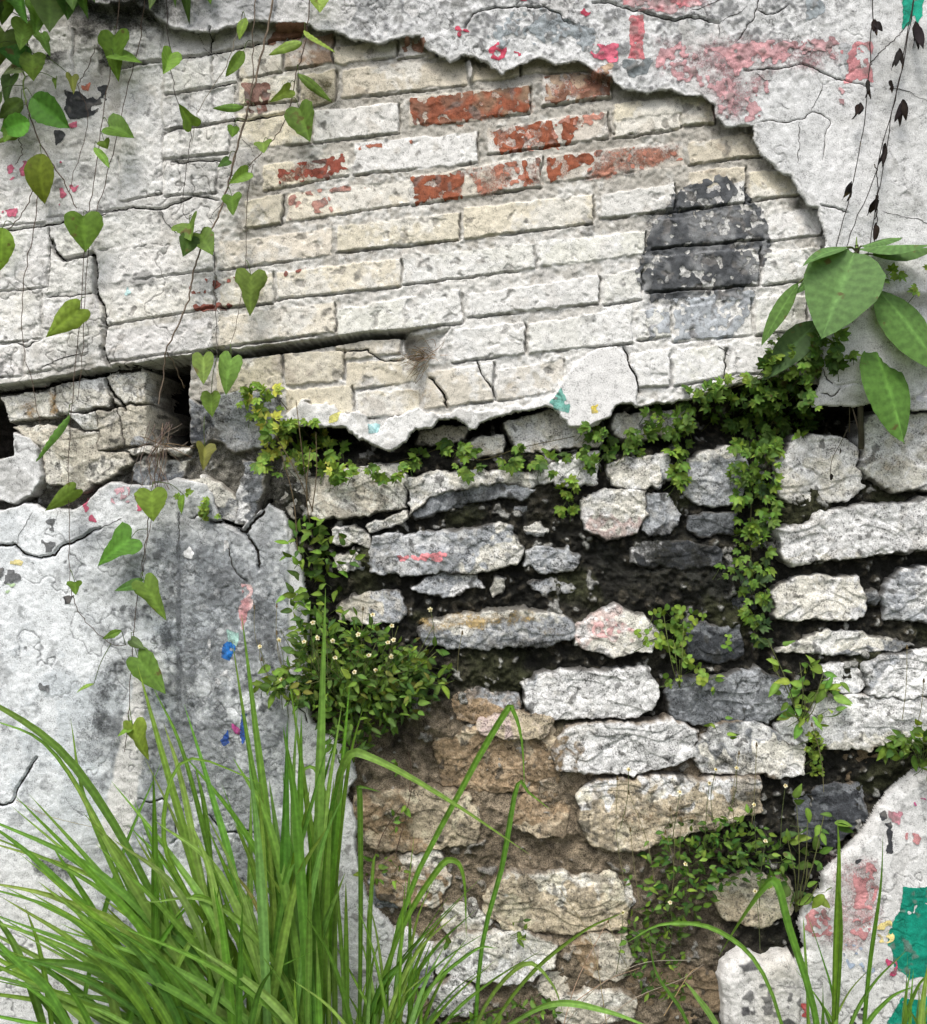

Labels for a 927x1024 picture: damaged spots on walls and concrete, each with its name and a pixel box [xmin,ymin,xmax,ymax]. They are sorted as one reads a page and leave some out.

crack [751,64,864,161]
crack [0,221,191,410]
flaking render [152,364,191,389]
crack [623,348,639,392]
flaking render [0,372,120,459]
crack [0,516,122,558]
flaking render [28,467,142,523]
flaking render [114,429,192,461]
flaking render [165,442,266,493]
crack [190,501,273,581]
flaking render [189,8,927,1024]
crack [0,760,36,806]